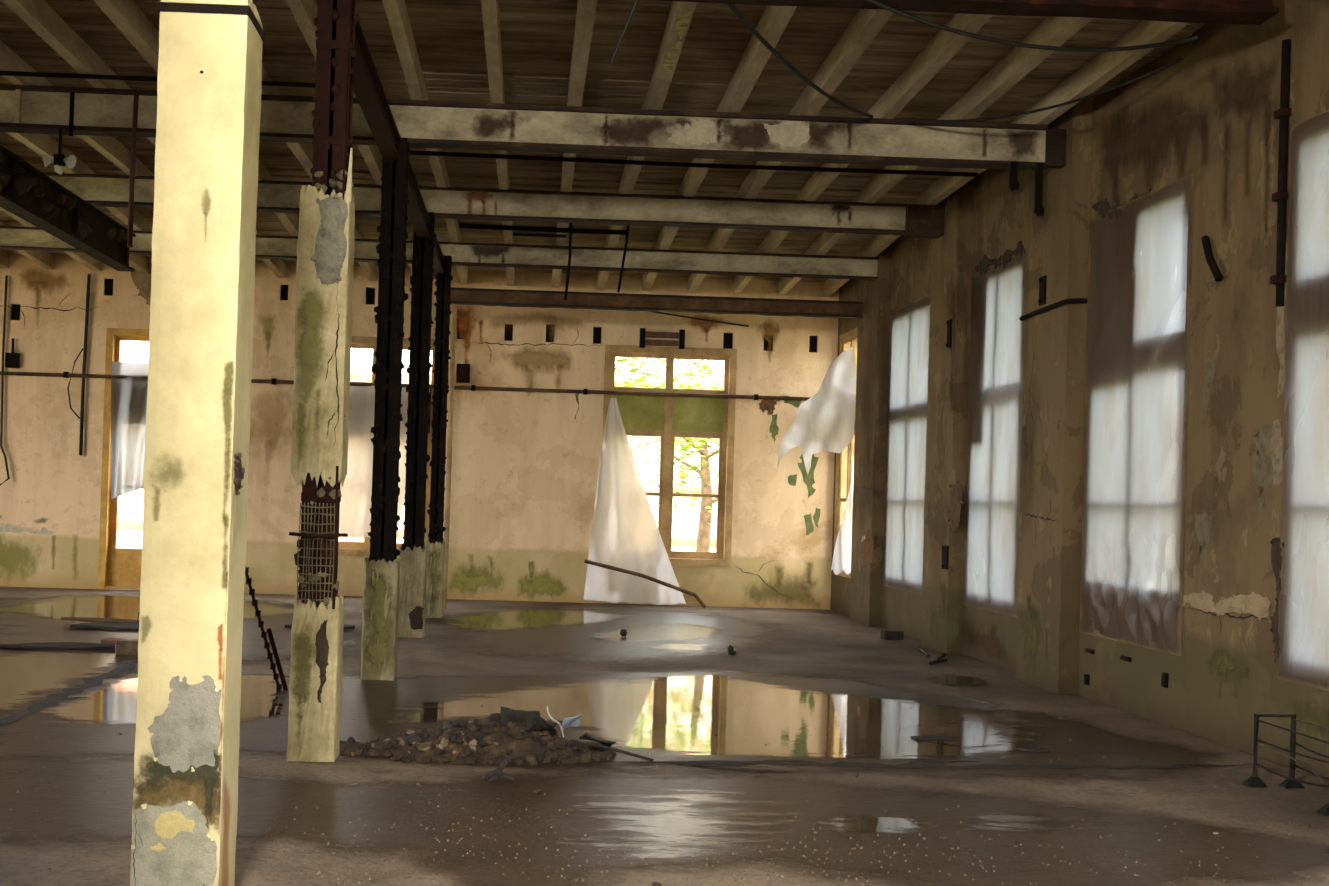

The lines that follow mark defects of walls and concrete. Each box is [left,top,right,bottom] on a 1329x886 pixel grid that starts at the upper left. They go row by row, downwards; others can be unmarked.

spalling [311,194,348,286]
peeling [759,395,802,444]
peeling [788,453,820,535]
leakage [0,596,139,659]
leakage [750,564,811,602]
flaking render [1182,537,1284,663]
leakage [0,677,222,842]
peeling [147,675,223,773]
leakage [236,599,1329,886]
peeling [130,801,217,886]